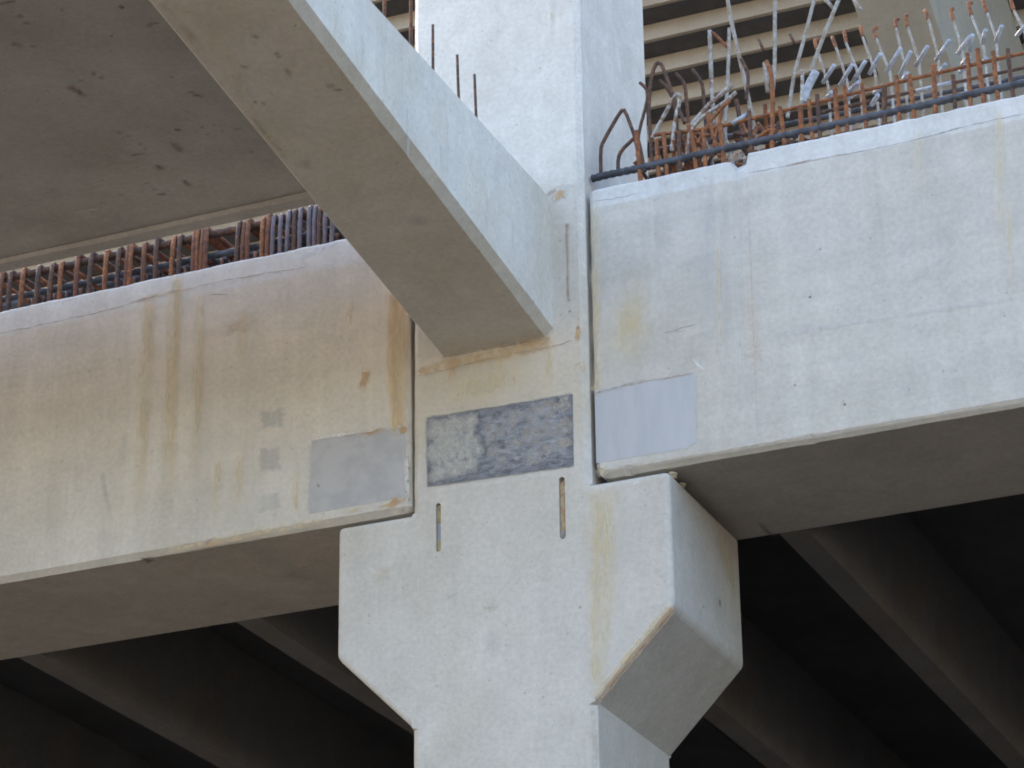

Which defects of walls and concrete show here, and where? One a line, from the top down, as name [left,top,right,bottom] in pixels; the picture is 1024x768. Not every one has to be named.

corrosion [389,295,406,433]